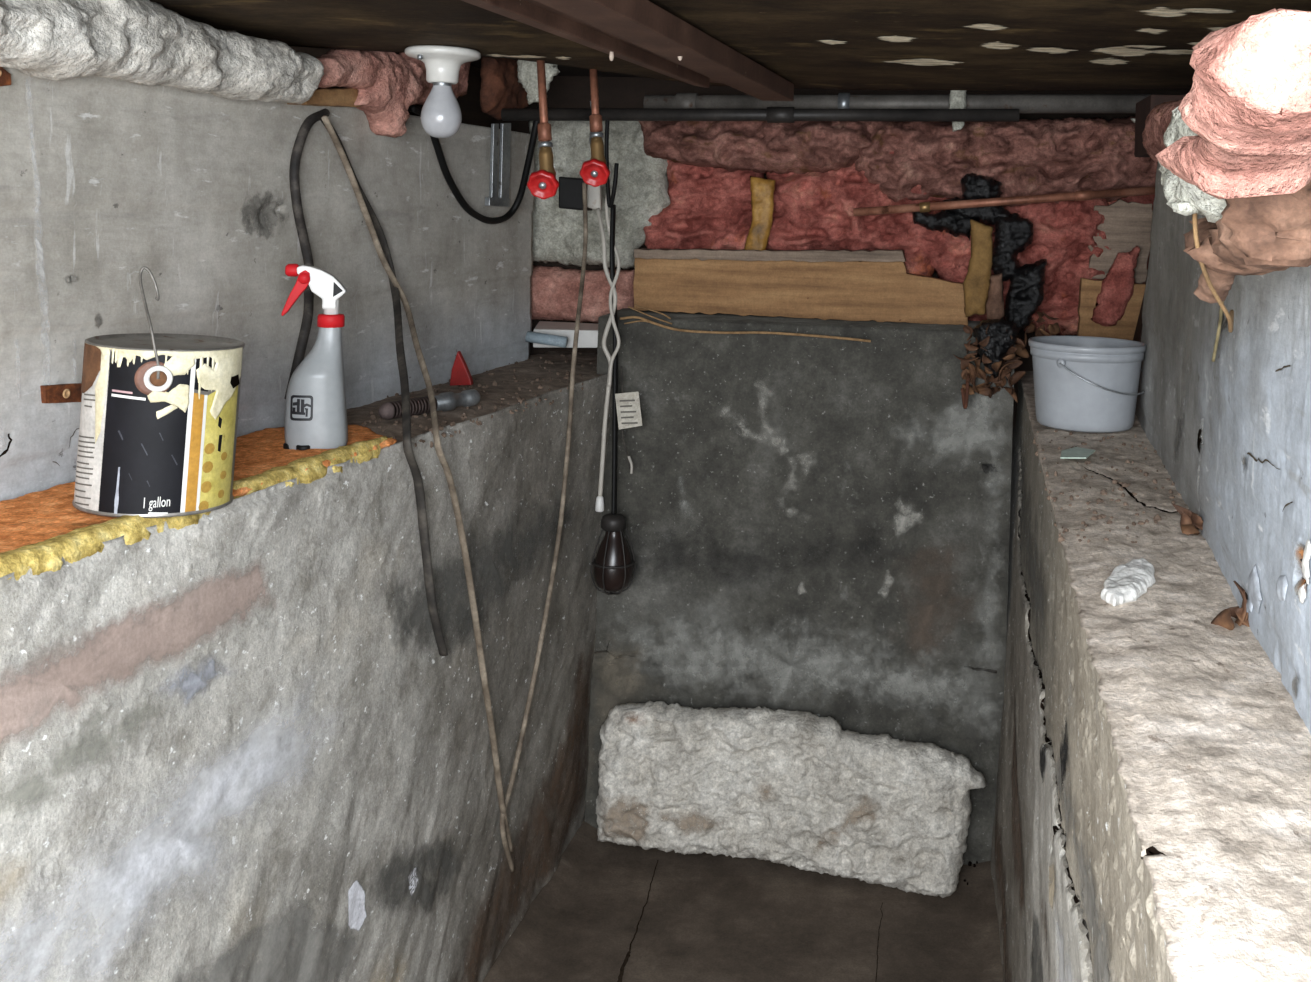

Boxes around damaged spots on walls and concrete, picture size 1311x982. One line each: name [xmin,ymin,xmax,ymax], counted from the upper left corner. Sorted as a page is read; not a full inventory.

leakage [936,382,1003,453]
leakage [895,505,921,534]
crack [1085,468,1189,513]
spalling [1294,539,1311,604]
crack [1017,447,1093,982]
crack [617,860,658,982]